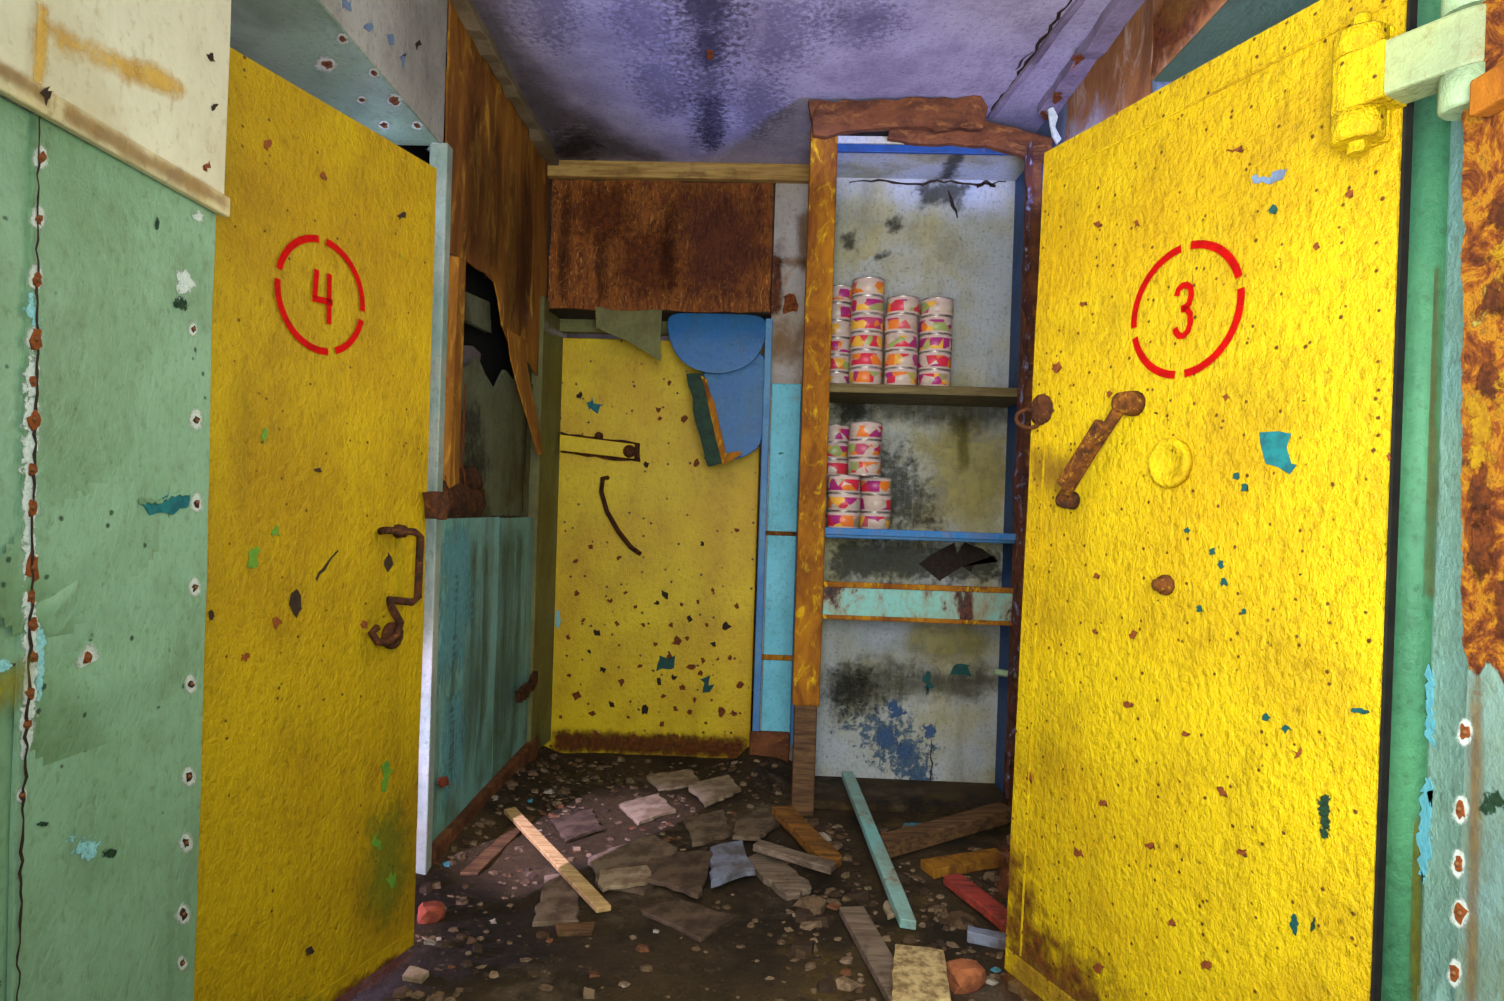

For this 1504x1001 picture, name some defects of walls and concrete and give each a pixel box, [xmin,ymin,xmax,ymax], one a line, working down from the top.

leakage [666,0,753,151]
rust [1481,0,1504,72]
rust [445,0,550,376]
rust [769,256,798,314]
rust [29,329,43,350]
rust [27,410,42,431]
rust [1460,108,1504,683]
rust [28,499,38,517]
rust [25,552,39,632]
rust [551,588,746,758]
leakage [830,623,995,718]
rust [1456,721,1478,836]